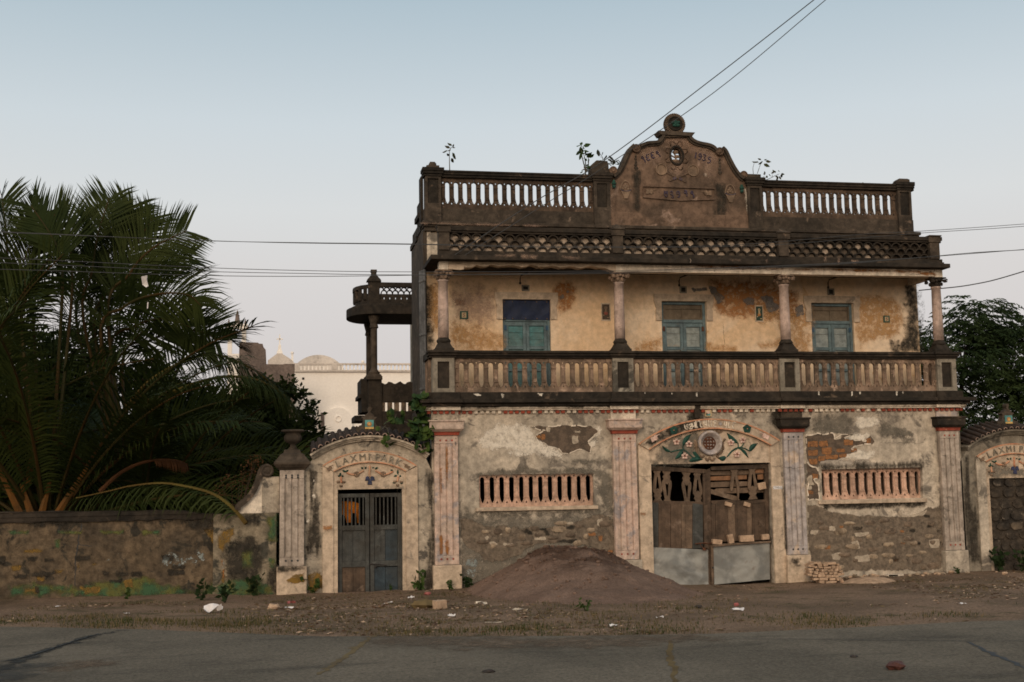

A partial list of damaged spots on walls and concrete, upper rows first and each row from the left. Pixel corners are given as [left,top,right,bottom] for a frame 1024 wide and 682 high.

peeling [554,283,575,310]
damp [890,285,923,352]
peeling [478,422,602,458]
spalling [805,416,944,572]
damp [222,513,300,590]
spalling [459,514,615,563]